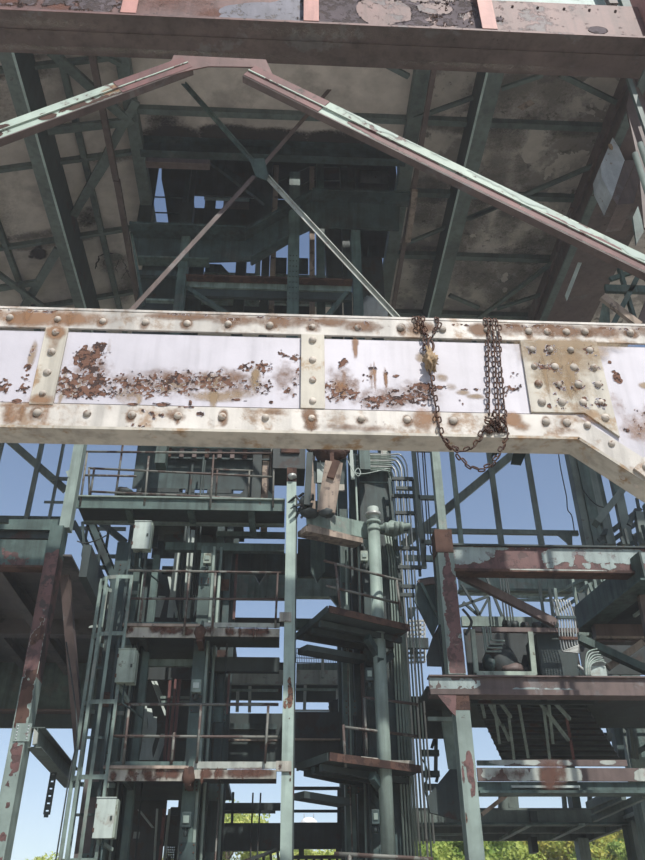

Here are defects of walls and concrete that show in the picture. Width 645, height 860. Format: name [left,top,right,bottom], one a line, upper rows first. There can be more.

rust [0,342,301,428]
rust [141,313,457,431]
rust [452,323,645,429]
peeling [453,547,530,565]
rust [442,552,466,674]
rust [14,617,45,728]
rust [5,741,23,787]
rust [128,769,179,779]
rust [200,767,272,783]
rust [461,751,476,798]
peeling [557,760,582,782]
peeling [634,768,645,781]